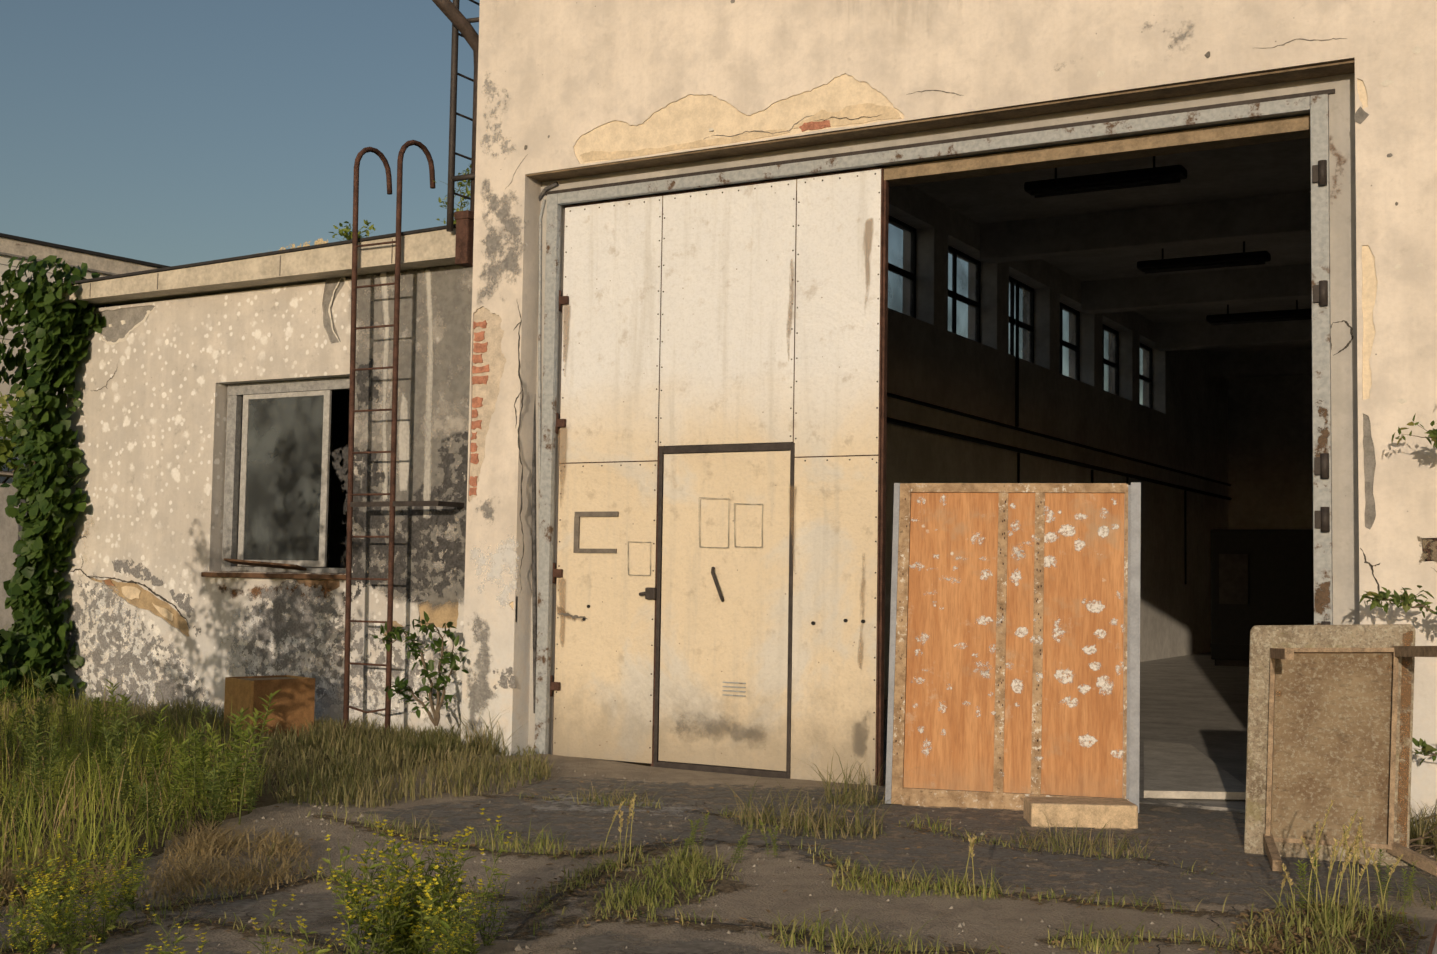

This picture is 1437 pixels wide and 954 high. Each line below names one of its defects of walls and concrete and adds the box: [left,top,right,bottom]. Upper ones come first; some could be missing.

crack [1272,38,1347,48]
peeling [574,74,905,164]
spalling [469,307,506,501]
peeling [67,559,207,710]
peeling [240,579,459,711]